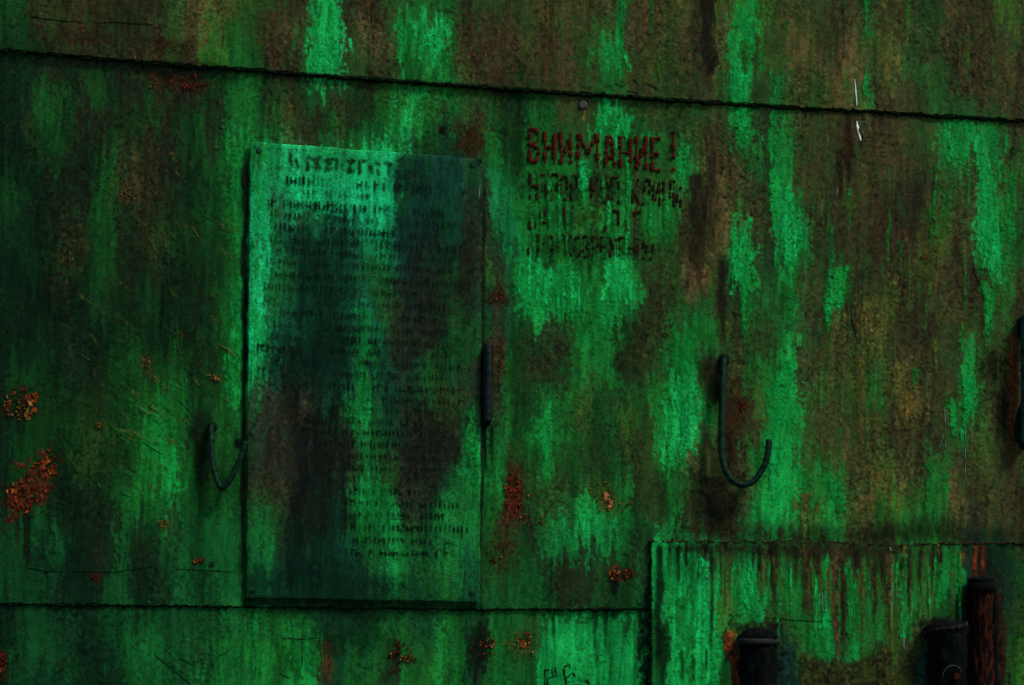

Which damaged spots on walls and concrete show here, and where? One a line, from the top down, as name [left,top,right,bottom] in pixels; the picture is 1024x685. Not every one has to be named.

corrosion [2,385,40,420]
corrosion [0,448,58,523]
corrosion [590,479,631,511]
corrosion [389,639,416,673]